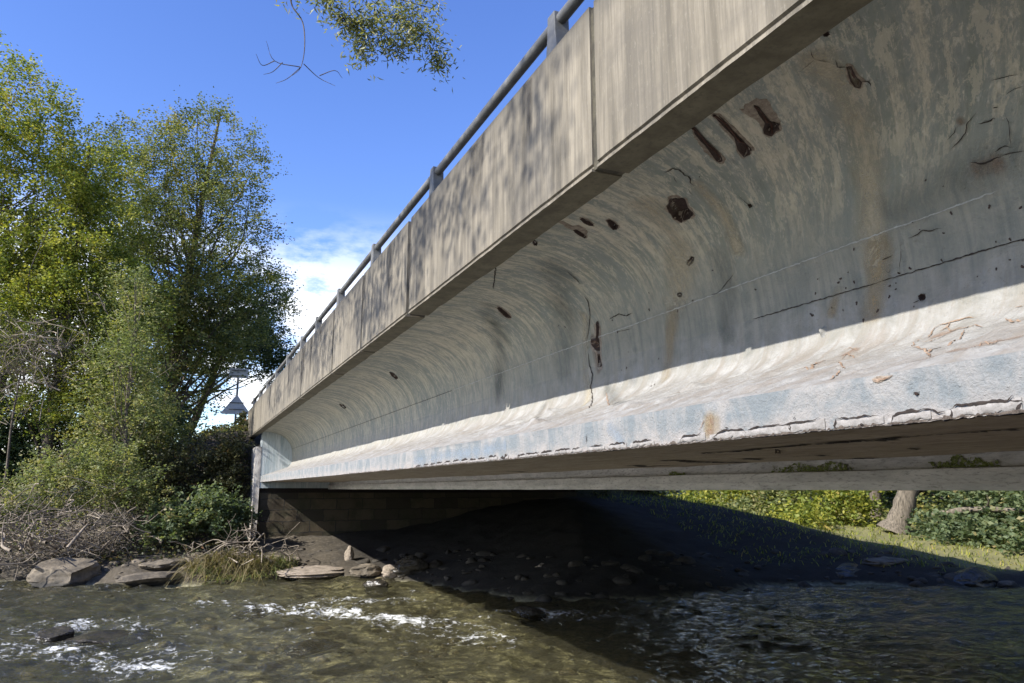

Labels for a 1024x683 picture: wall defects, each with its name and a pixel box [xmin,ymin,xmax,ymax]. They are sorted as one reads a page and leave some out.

spalling [836,62,871,90]
spalling [692,113,755,164]
spalling [740,98,782,138]
crack [949,75,1023,165]
hole [664,195,696,224]
crack [911,306,1021,356]
corrosion [588,321,602,408]